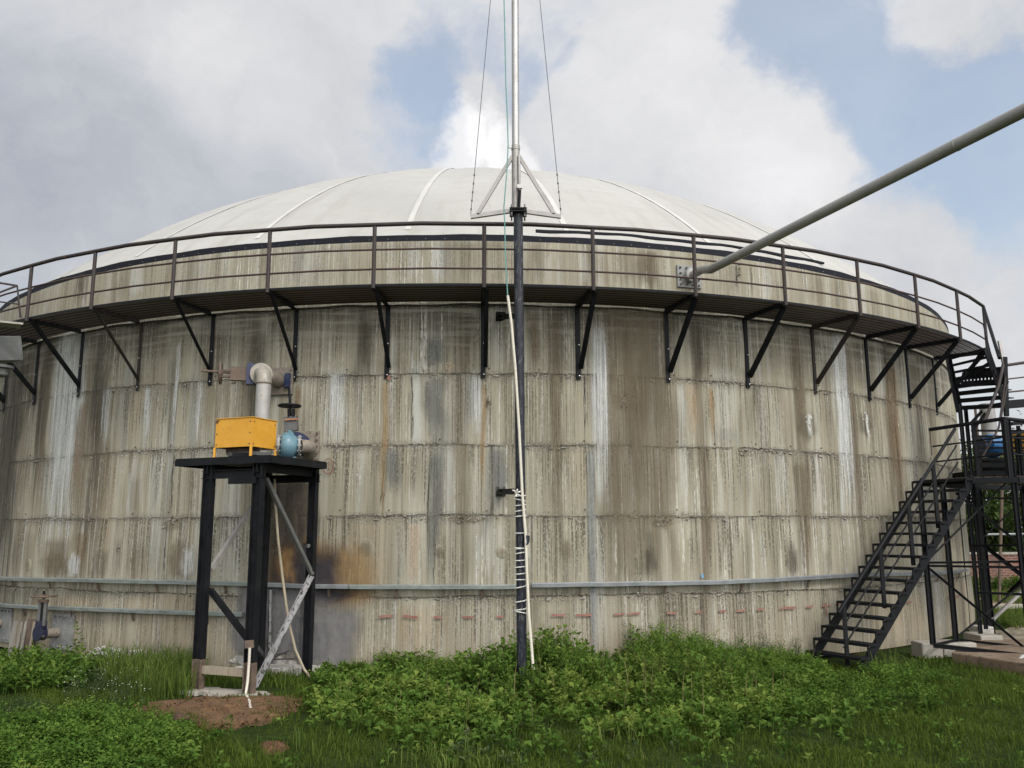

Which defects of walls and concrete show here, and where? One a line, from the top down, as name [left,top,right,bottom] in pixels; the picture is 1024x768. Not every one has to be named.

water stain [52,338,79,478]
water stain [834,343,854,470]